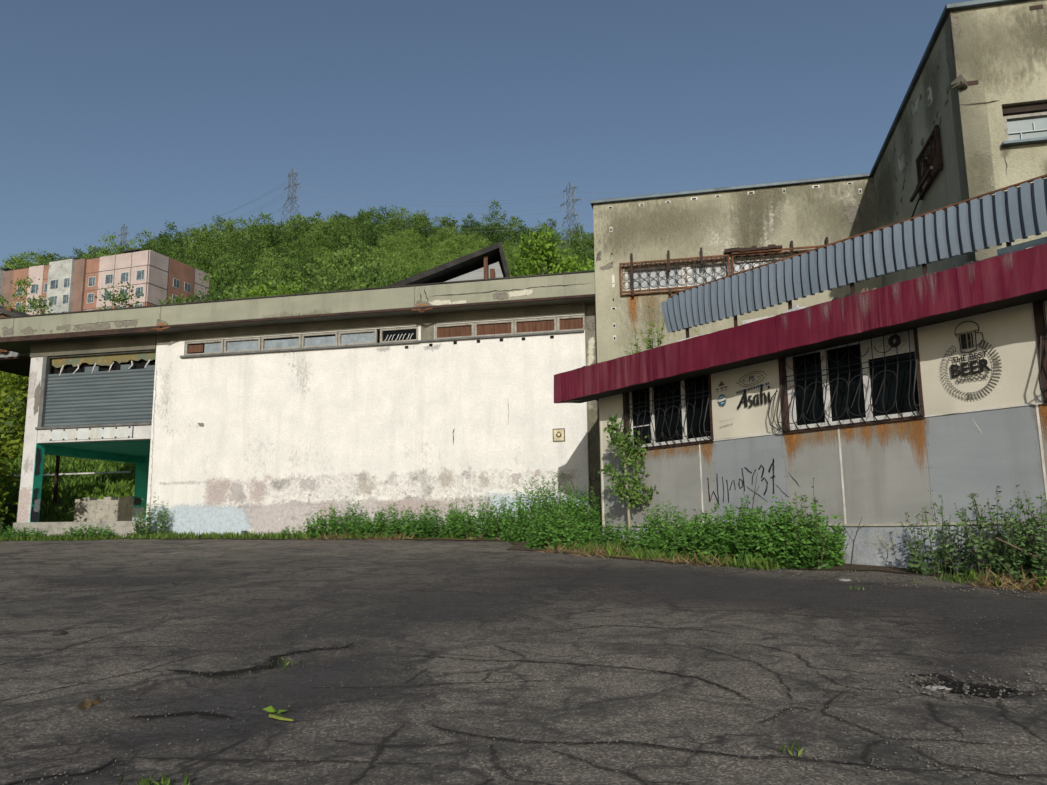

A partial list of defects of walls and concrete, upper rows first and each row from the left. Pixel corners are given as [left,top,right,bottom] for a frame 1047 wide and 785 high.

damp [737,186,788,248]
corrosion [785,419,924,454]
peeling [132,468,589,536]
spalling [909,673,1021,696]